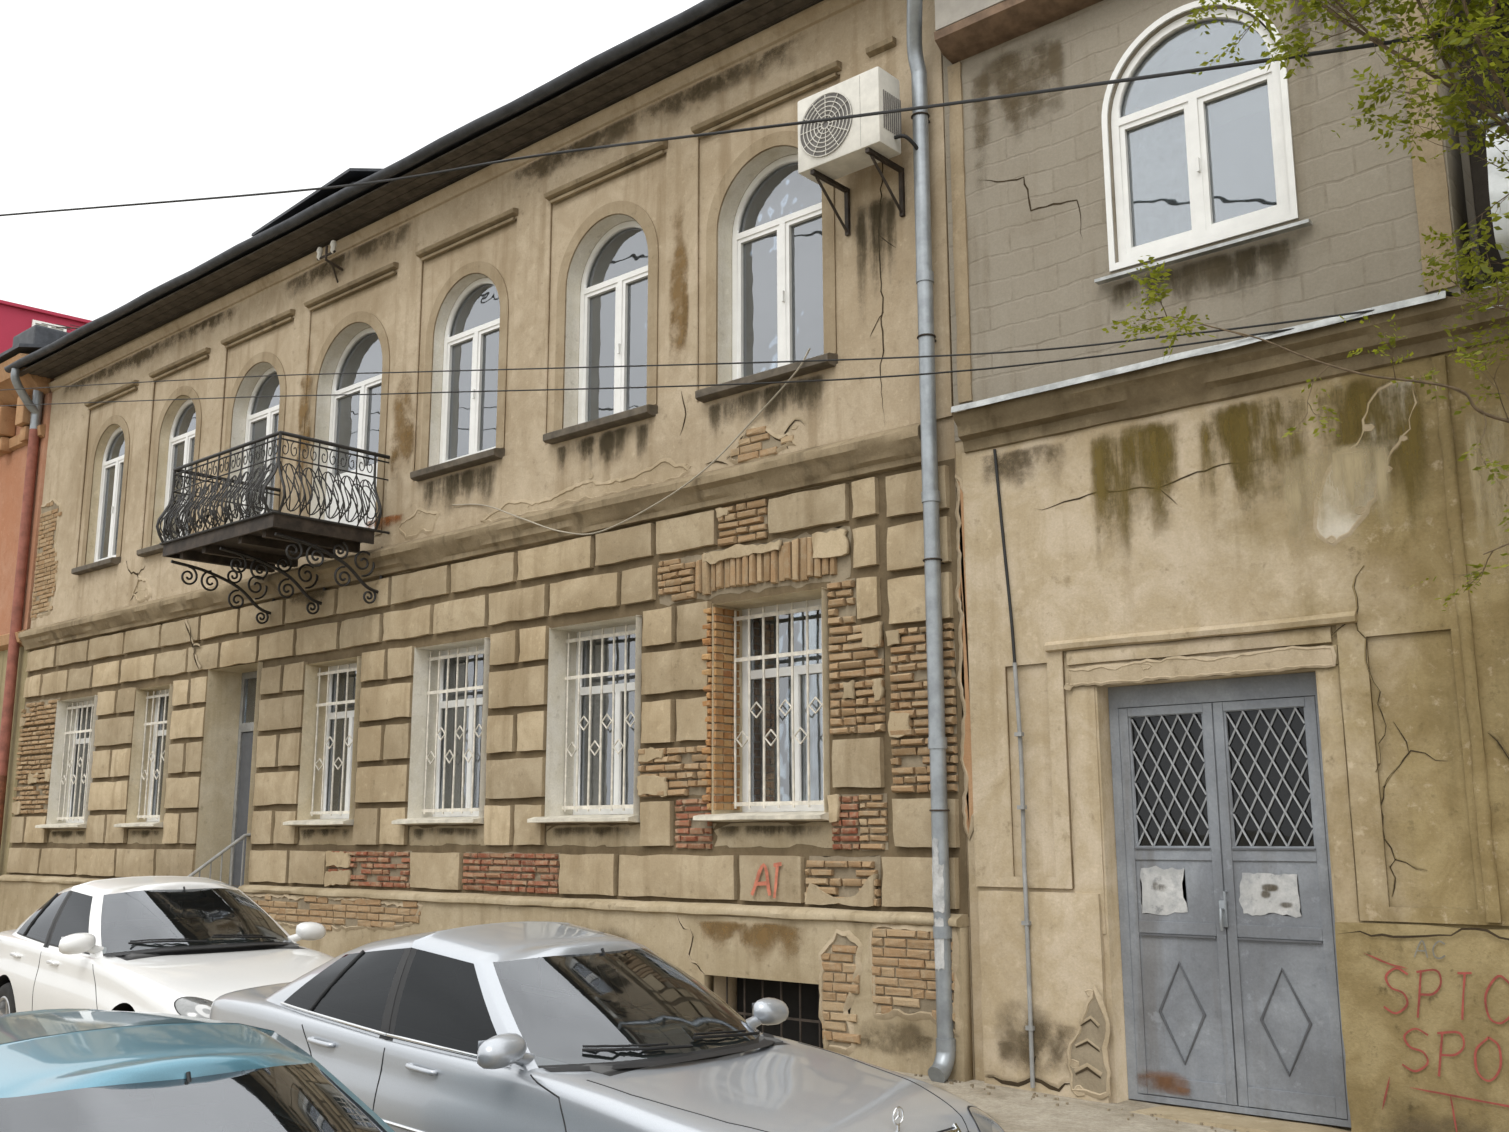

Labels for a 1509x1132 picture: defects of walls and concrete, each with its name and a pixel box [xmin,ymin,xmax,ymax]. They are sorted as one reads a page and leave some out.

damp [857,199,895,256]
crack [987,177,1082,236]
damp [392,394,412,461]
damp [1092,424,1174,529]
flaking render [30,498,62,621]
flaking render [804,474,974,1056]
crack [1331,565,1447,897]
crack [1488,730,1509,759]
flaking render [245,850,423,932]
flaking render [462,852,560,894]
crack [1339,927,1509,940]